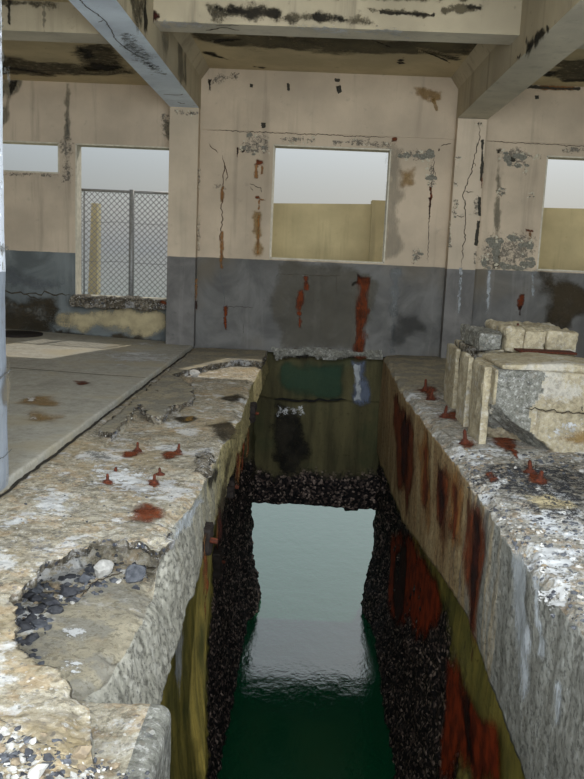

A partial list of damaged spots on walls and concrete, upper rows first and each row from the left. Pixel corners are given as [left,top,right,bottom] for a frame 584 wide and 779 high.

water stain [2,44,133,124]
water stain [158,0,481,64]
water stain [543,59,584,82]
peeling [473,139,541,271]
crack [456,122,580,300]
rust [353,275,370,359]
water stain [532,271,584,329]
crack [0,350,191,498]
crack [526,406,584,414]
rust [131,503,164,522]
rust [393,395,485,661]
spalling [0,521,175,779]